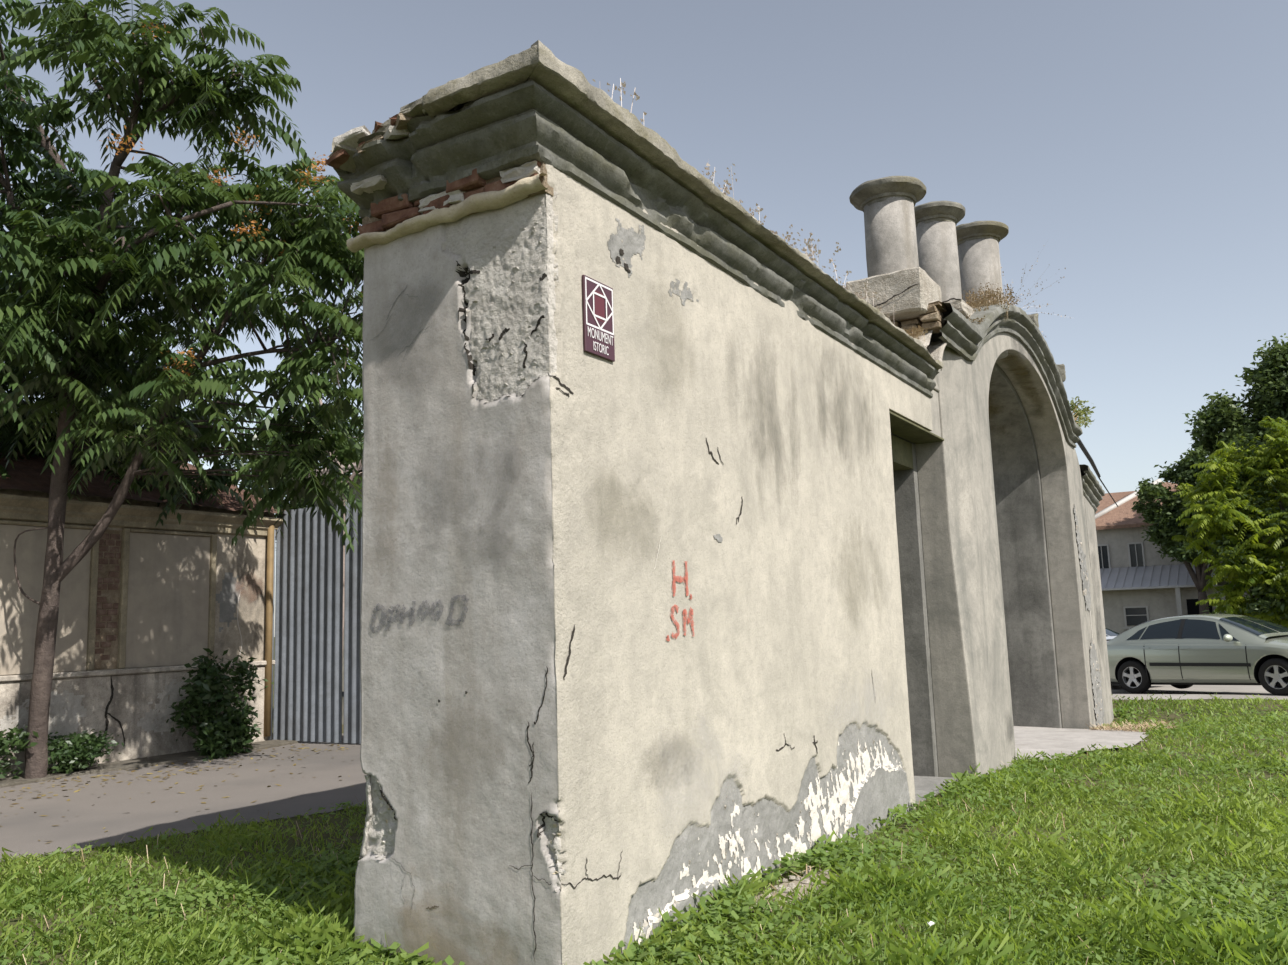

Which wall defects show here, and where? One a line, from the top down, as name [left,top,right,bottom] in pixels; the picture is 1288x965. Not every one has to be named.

spalling [325,97,429,173]
flaking render [358,160,559,403]
peeling [608,218,646,278]
flaking render [890,305,945,334]
flaking render [359,774,397,860]
flaking render [537,812,566,892]
crack [512,625,623,960]